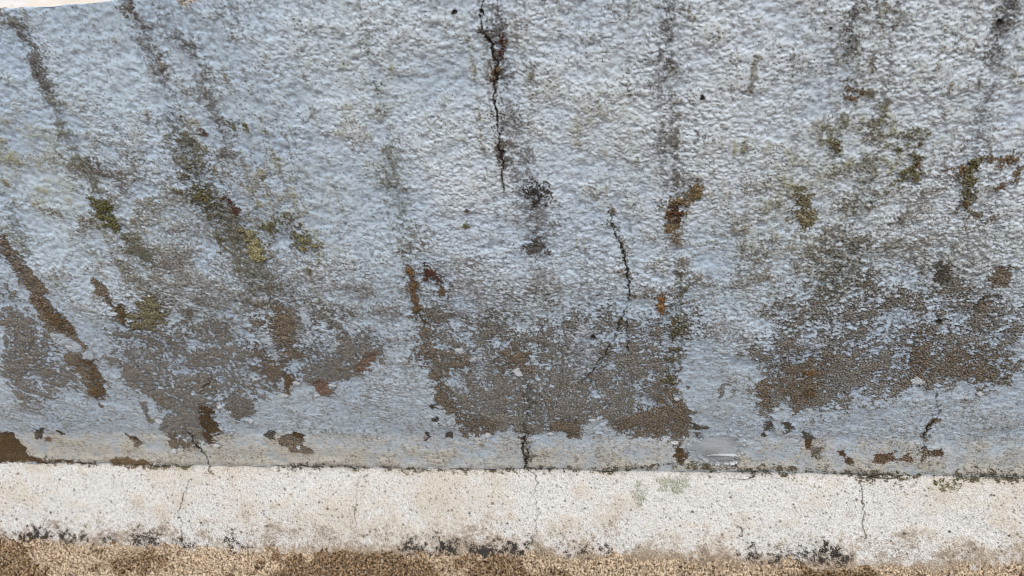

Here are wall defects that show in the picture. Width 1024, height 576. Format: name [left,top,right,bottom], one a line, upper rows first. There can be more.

water stain [0,7,126,208]
water stain [126,14,168,84]
crack [473,0,511,192]
water stain [2,182,30,258]
water stain [104,221,159,269]
water stain [157,64,282,296]
corrosion [406,262,453,299]
crack [576,204,638,387]
water stain [659,269,691,388]
corrosion [655,181,712,243]
water stain [820,156,883,290]
crack [517,429,538,503]